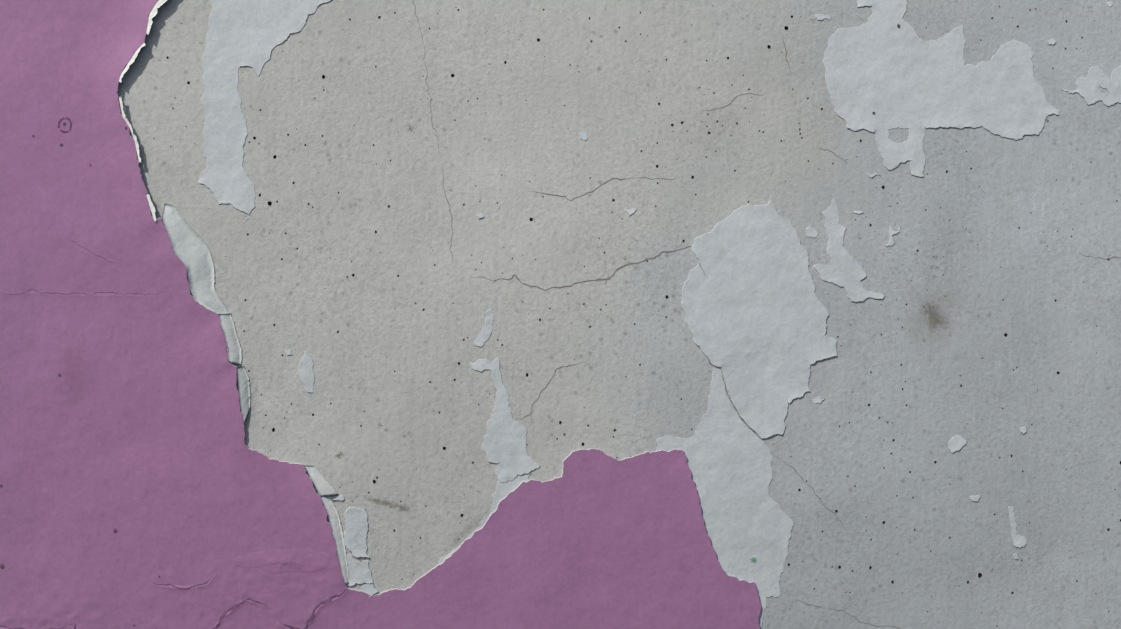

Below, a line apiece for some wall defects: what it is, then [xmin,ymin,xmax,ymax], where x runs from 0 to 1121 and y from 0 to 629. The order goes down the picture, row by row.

crack [534,177,672,201]
crack [484,246,706,291]
peeling [0,0,794,629]